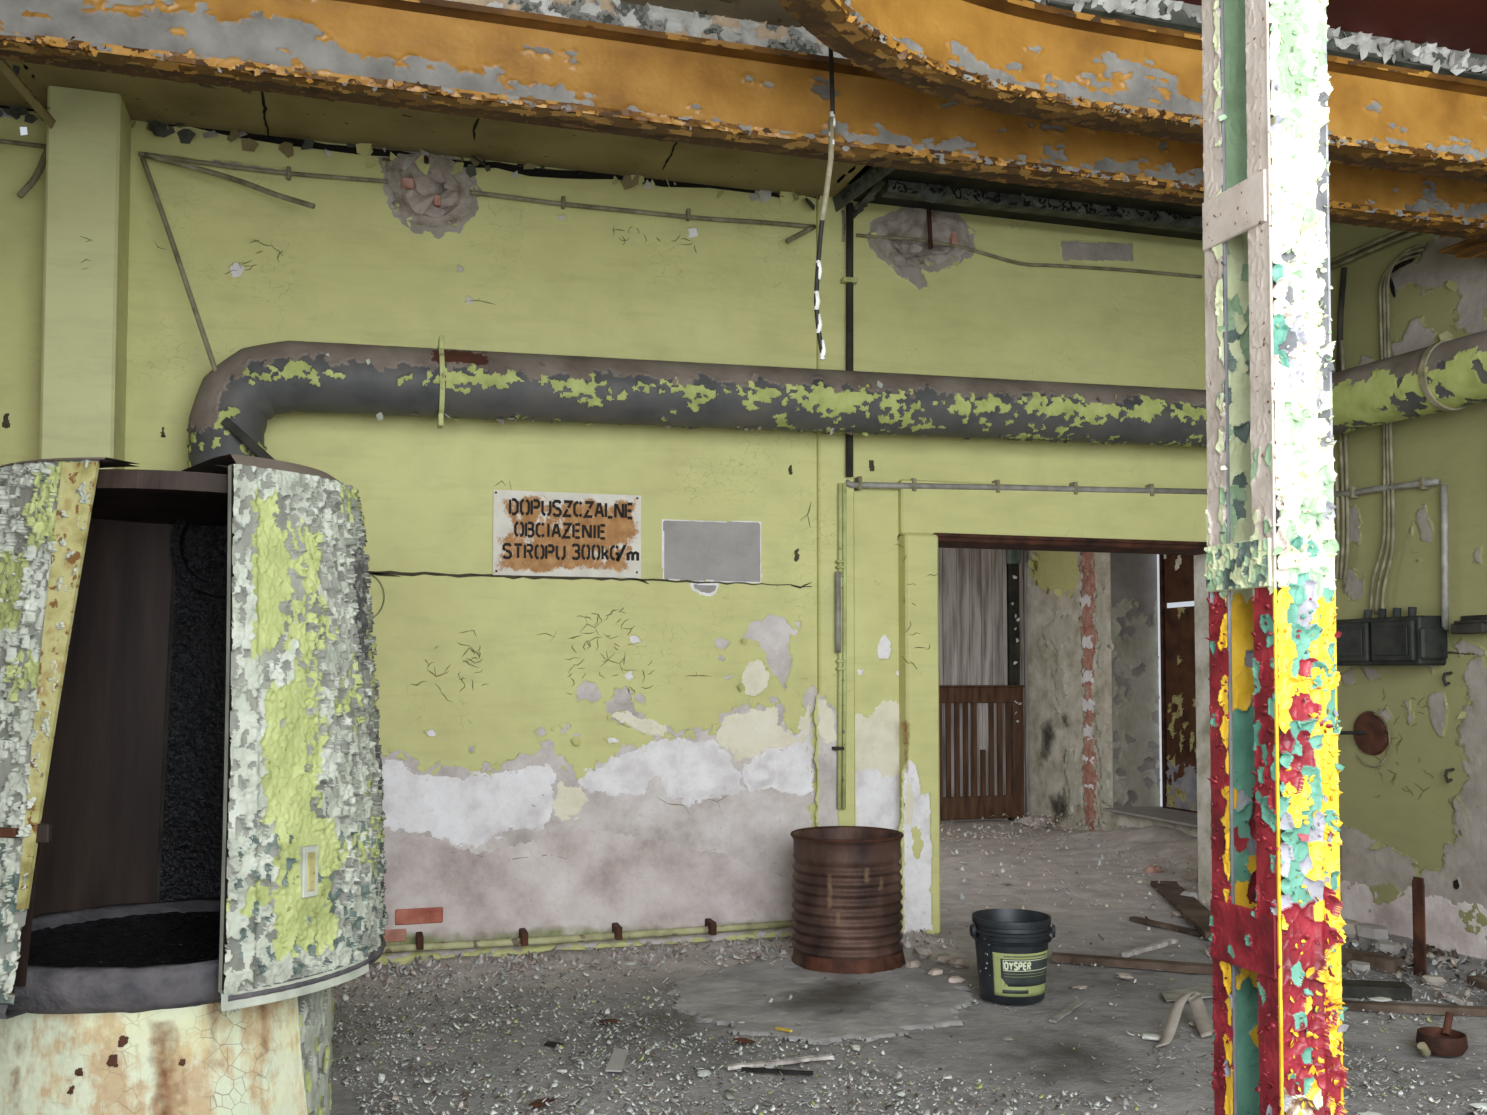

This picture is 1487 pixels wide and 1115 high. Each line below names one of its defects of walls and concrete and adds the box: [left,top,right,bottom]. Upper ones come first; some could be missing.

peeling [285,68,534,108]
peeling [846,10,1227,128]
peeling [1073,0,1133,13]
peeling [1166,1,1202,20]
spalling [378,150,482,239]
spalling [841,173,990,291]
peeling [911,149,1125,181]
peeling [0,470,54,603]
peeling [1250,0,1487,1115]
crack [368,571,812,702]
peeling [357,612,935,964]
peeling [1205,598,1231,900]